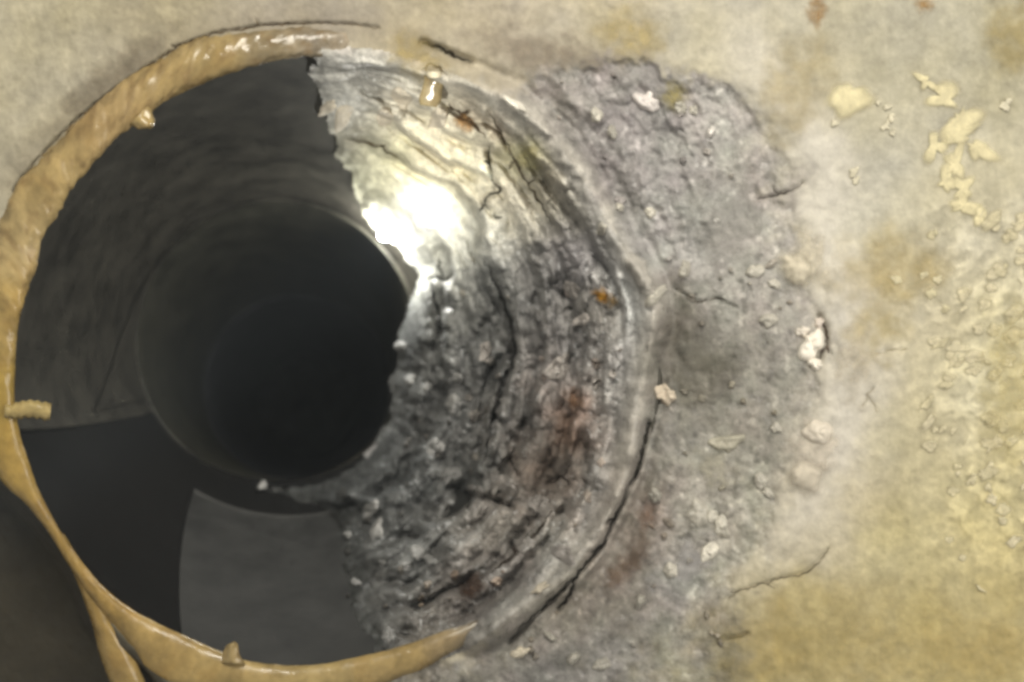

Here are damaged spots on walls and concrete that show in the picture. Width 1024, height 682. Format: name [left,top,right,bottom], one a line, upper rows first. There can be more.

crack [422,42,470,72]
crack [448,104,552,226]
spalling [391,55,833,682]
crack [492,511,552,572]
crack [510,422,648,639]
crack [731,547,829,597]